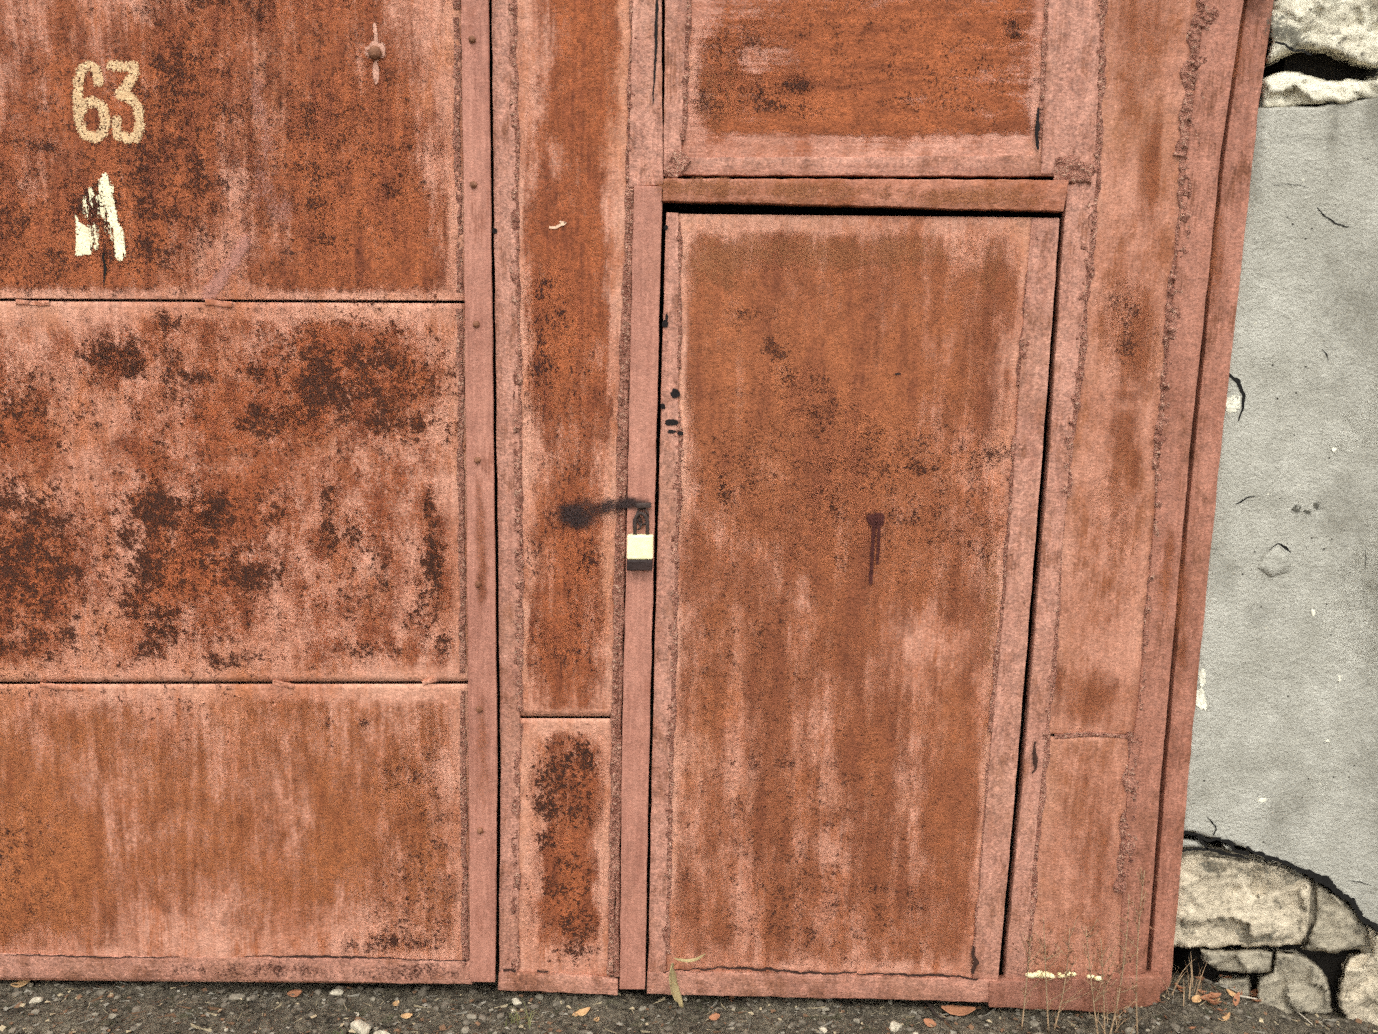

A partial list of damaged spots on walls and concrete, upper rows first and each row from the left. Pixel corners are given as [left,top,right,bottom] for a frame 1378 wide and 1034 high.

corrosion [1176,546,1186,616]
spalling [1174,834,1378,1026]